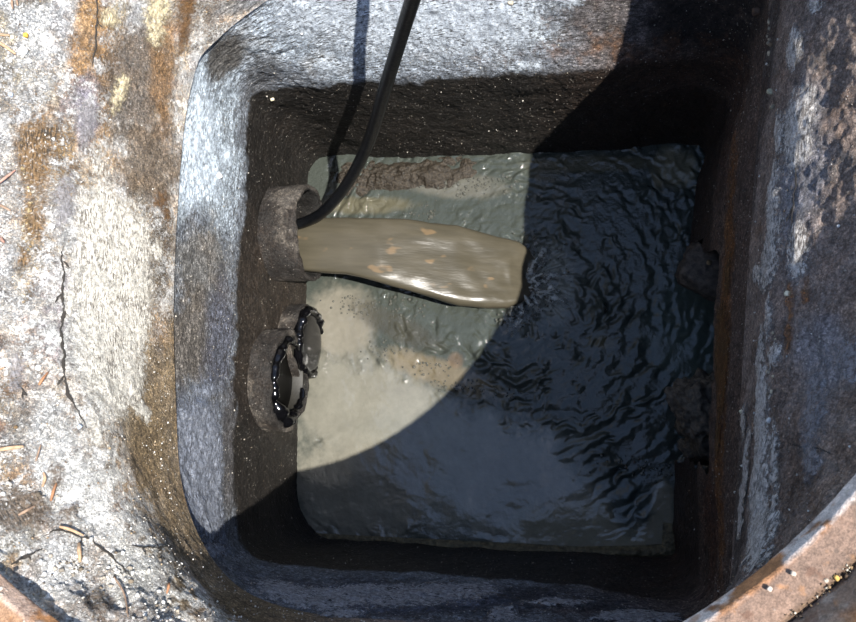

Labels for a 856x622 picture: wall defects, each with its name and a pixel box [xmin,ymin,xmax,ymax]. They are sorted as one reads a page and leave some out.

crack [55,247,87,428]
crack [11,528,175,577]